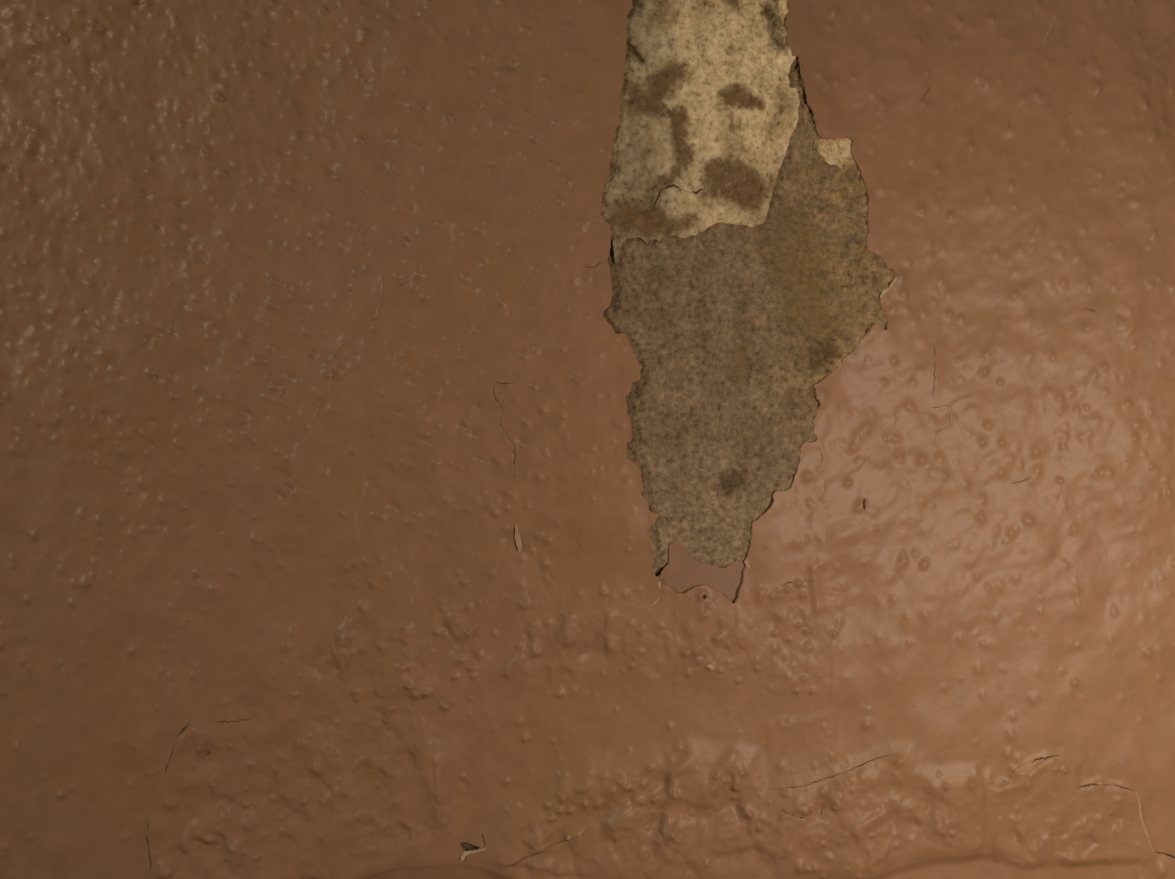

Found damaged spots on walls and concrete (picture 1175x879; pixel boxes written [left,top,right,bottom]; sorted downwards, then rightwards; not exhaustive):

peeling [600,0,897,605]
crack [771,755,888,819]
crack [989,755,1060,784]
crack [1079,783,1175,858]